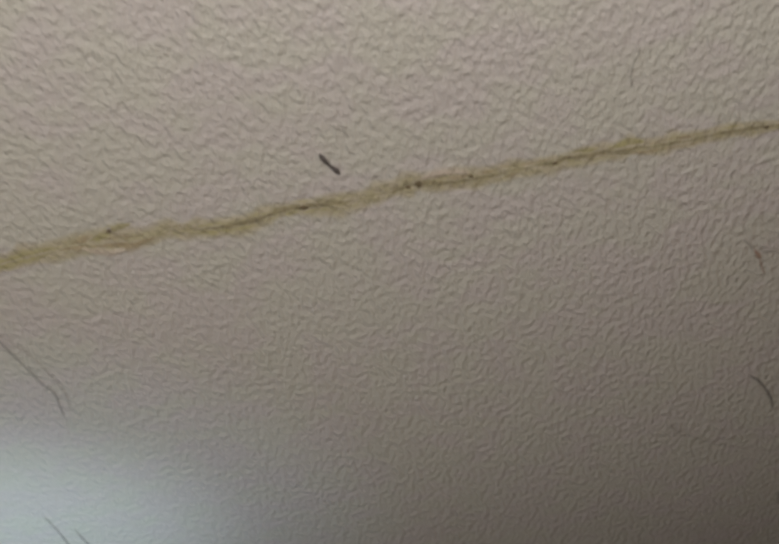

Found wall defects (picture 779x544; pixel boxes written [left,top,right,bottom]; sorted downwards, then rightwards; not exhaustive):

crack [0,121,779,266]
water stain [0,118,779,275]
crack [0,336,72,425]